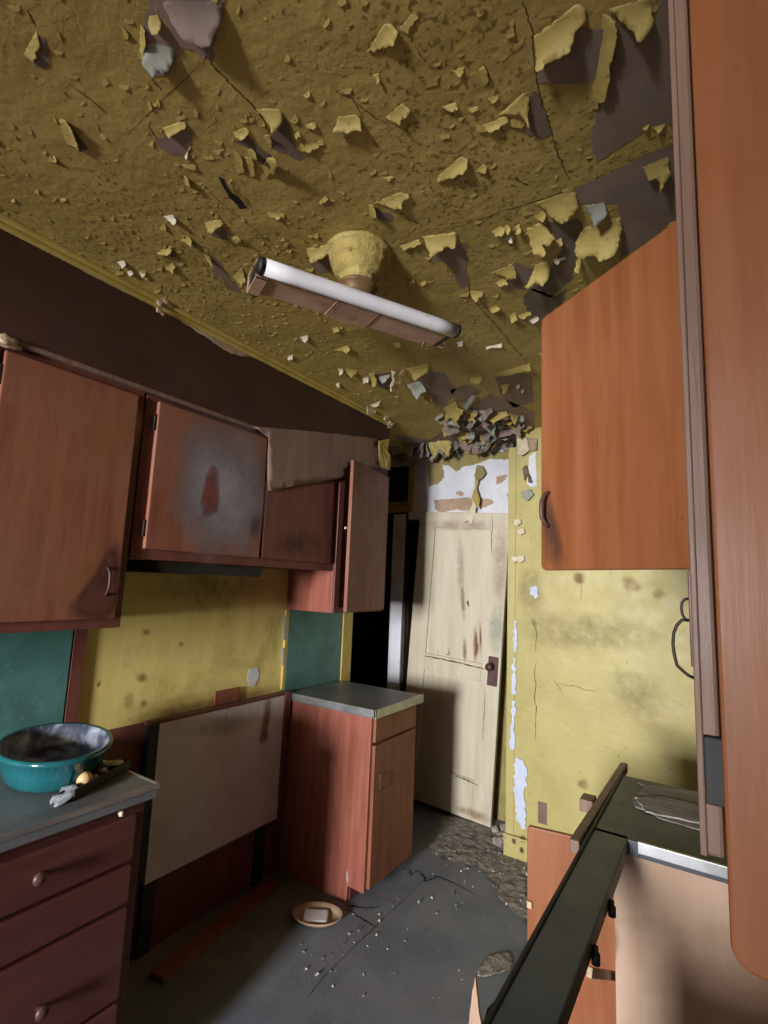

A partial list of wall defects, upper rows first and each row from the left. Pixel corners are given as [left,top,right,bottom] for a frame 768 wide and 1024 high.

peeling [138,0,225,78]
peeling [218,108,362,209]
peeling [366,12,419,53]
peeling [400,232,483,302]
peeling [437,157,488,184]
crack [404,2,582,233]
peeling [451,0,673,163]
peeling [488,145,676,324]
flaking render [336,363,537,501]
peeling [509,620,547,830]
crack [534,627,593,740]
crack [306,868,475,999]